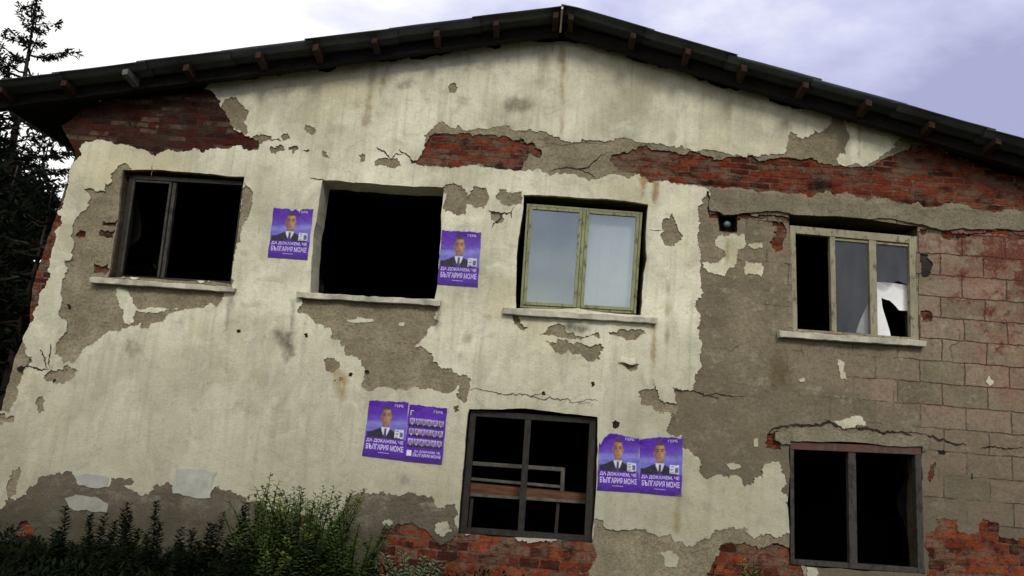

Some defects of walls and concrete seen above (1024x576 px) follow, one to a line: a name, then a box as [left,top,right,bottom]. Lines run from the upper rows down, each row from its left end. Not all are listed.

spalling [62,89,309,161]
crack [552,142,607,178]
spalling [0,117,1024,576]
crack [468,388,598,404]
crack [674,388,742,399]
crack [768,389,1023,450]